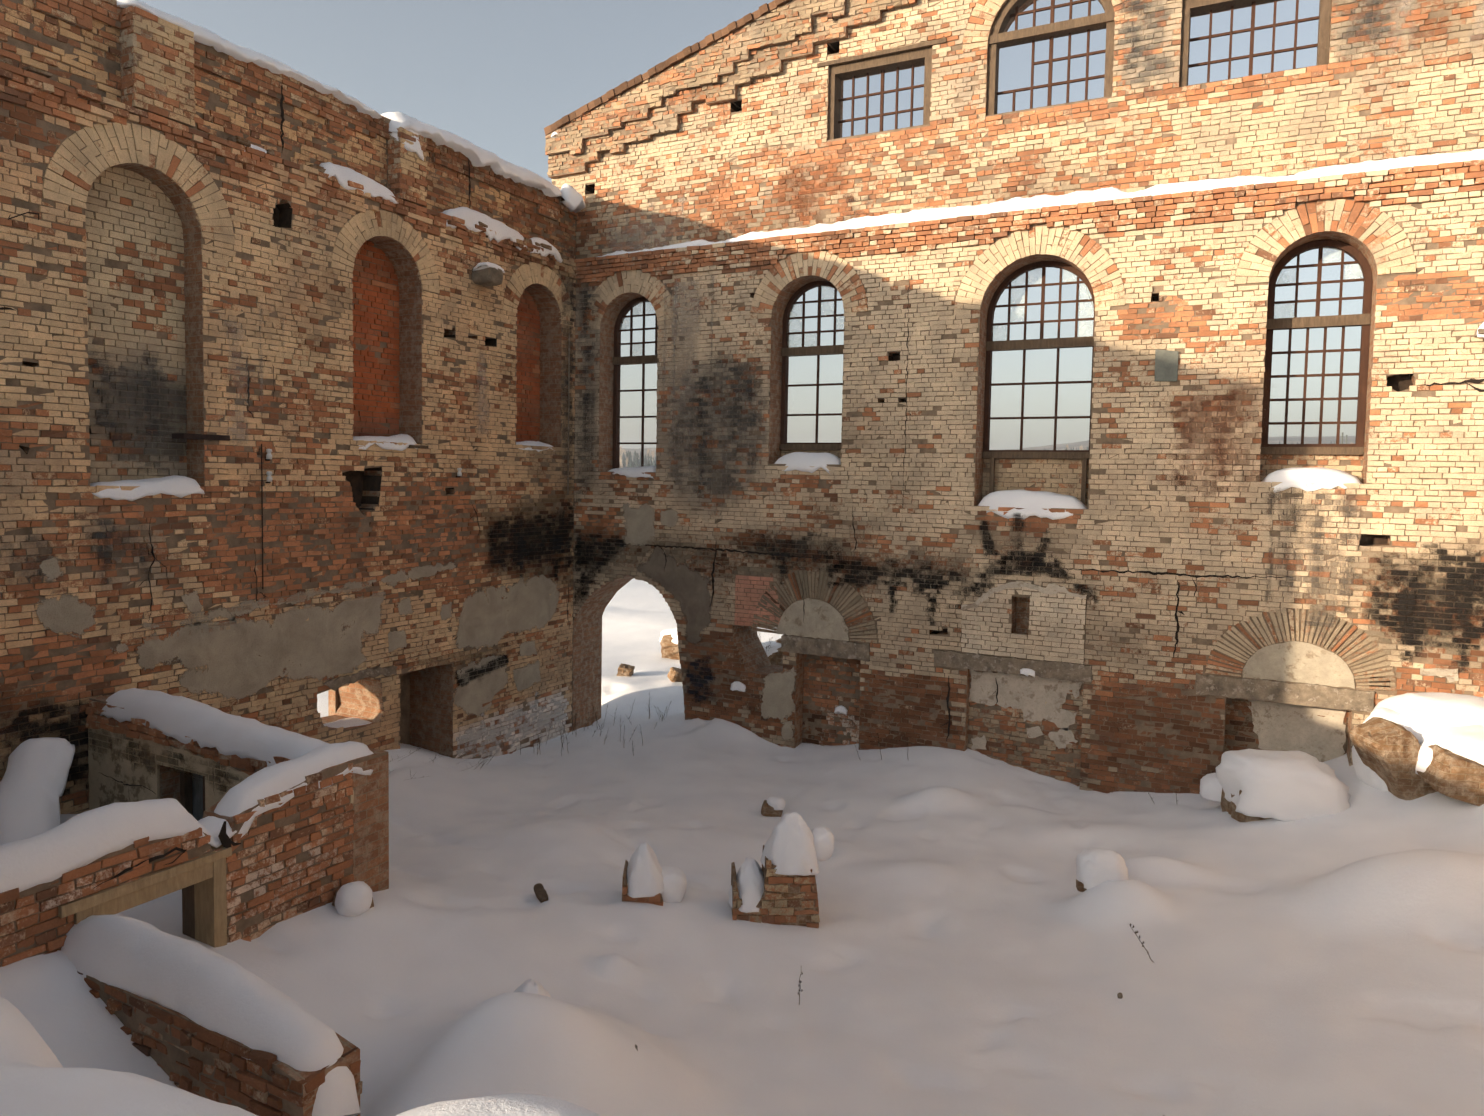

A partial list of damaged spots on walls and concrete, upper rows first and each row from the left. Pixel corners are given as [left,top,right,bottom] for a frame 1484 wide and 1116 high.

crack [1417,379,1484,392]
flaking render [0,467,478,712]
flaking render [440,574,561,717]
water stain [979,514,1050,567]
water stain [1394,580,1418,661]
water stain [1450,572,1484,672]